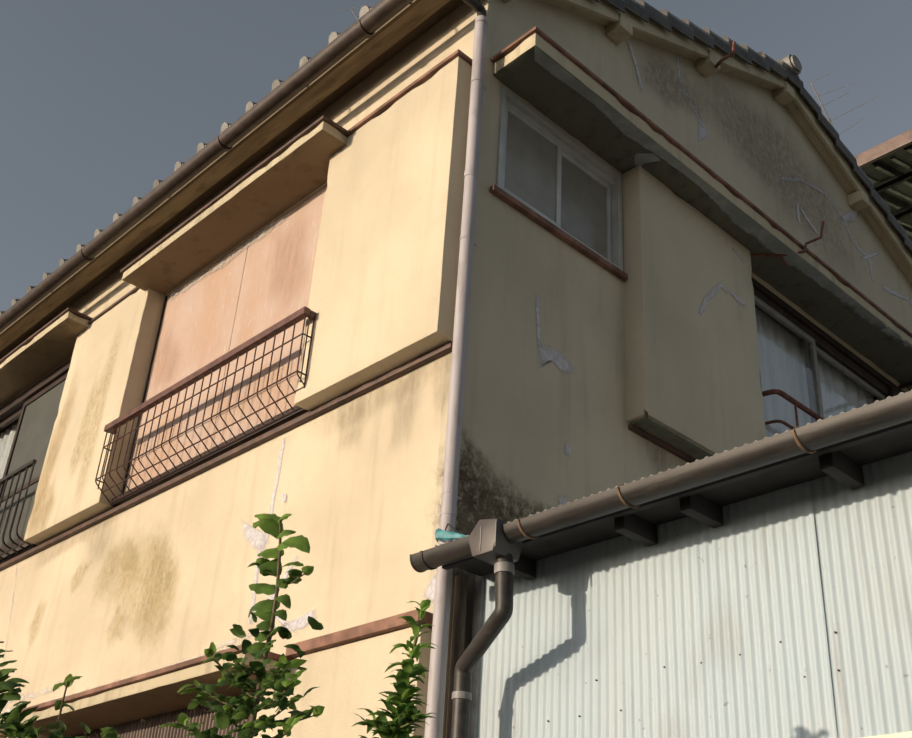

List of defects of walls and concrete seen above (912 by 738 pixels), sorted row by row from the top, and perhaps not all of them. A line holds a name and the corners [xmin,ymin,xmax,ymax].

crack [781,176,912,306]
crack [536,297,570,371]
crack [243,441,314,630]
damp [455,442,543,535]